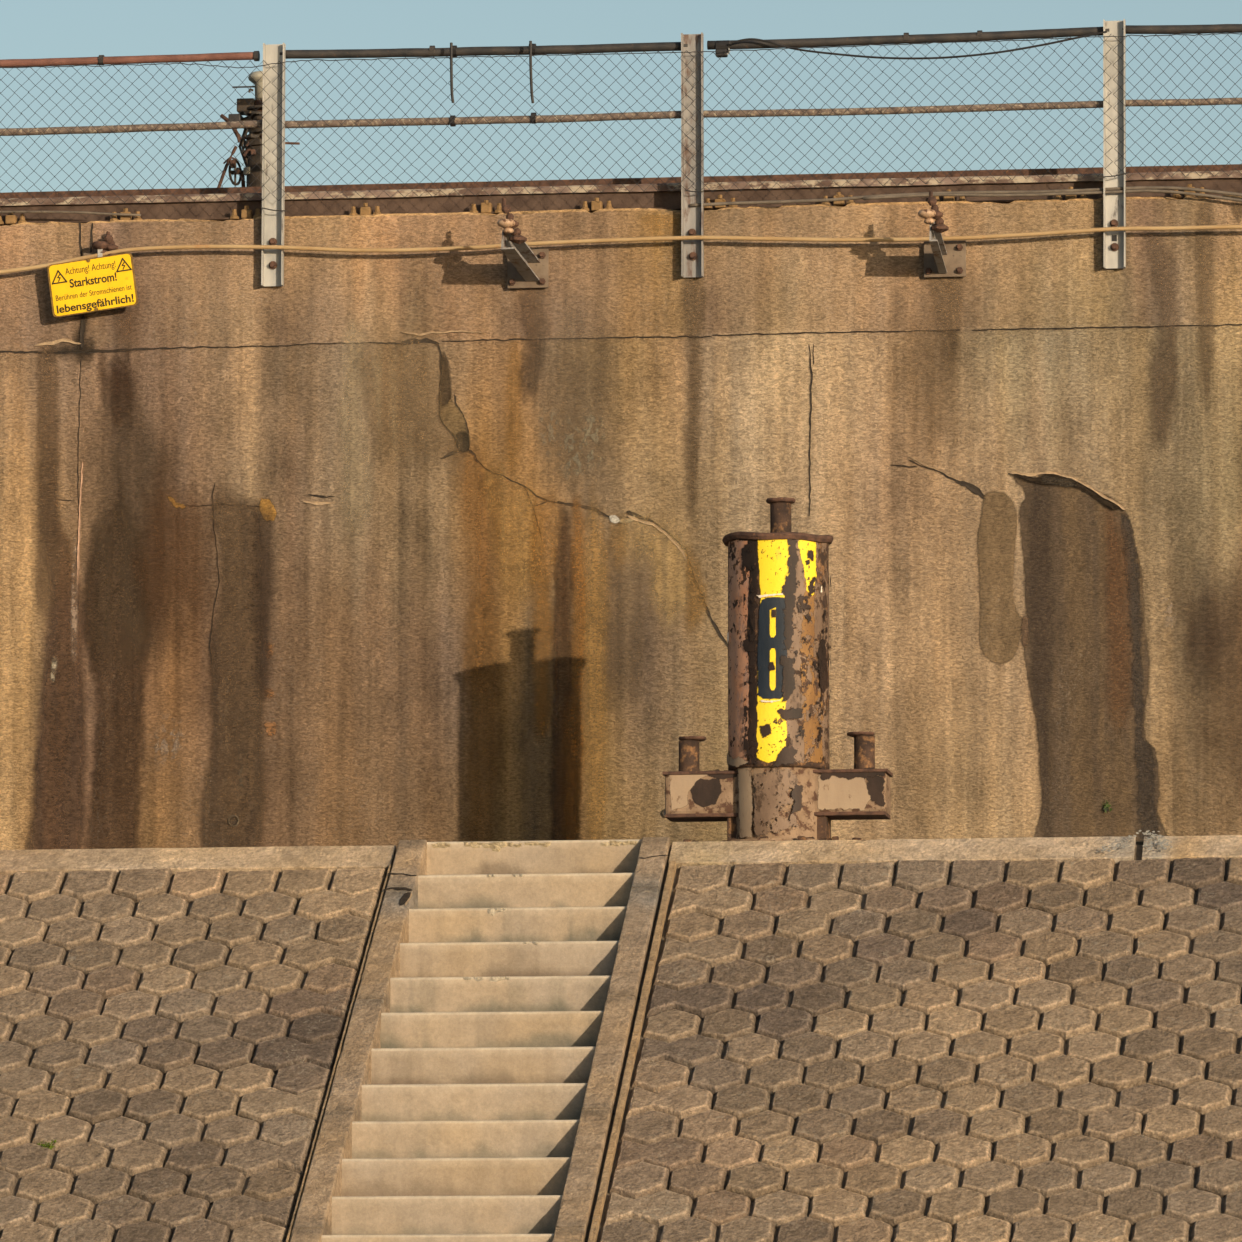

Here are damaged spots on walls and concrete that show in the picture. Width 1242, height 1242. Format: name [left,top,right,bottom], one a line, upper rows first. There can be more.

crack [79,221,93,256]
leakage [26,318,187,850]
leakage [202,494,272,848]
rust [566,503,606,840]
crack [0,315,1242,658]
rust [636,527,706,622]
rust [708,539,831,779]
rust [791,783,804,813]
rust [820,753,885,807]
spalling [1010,471,1126,510]
leakage [977,474,1167,842]